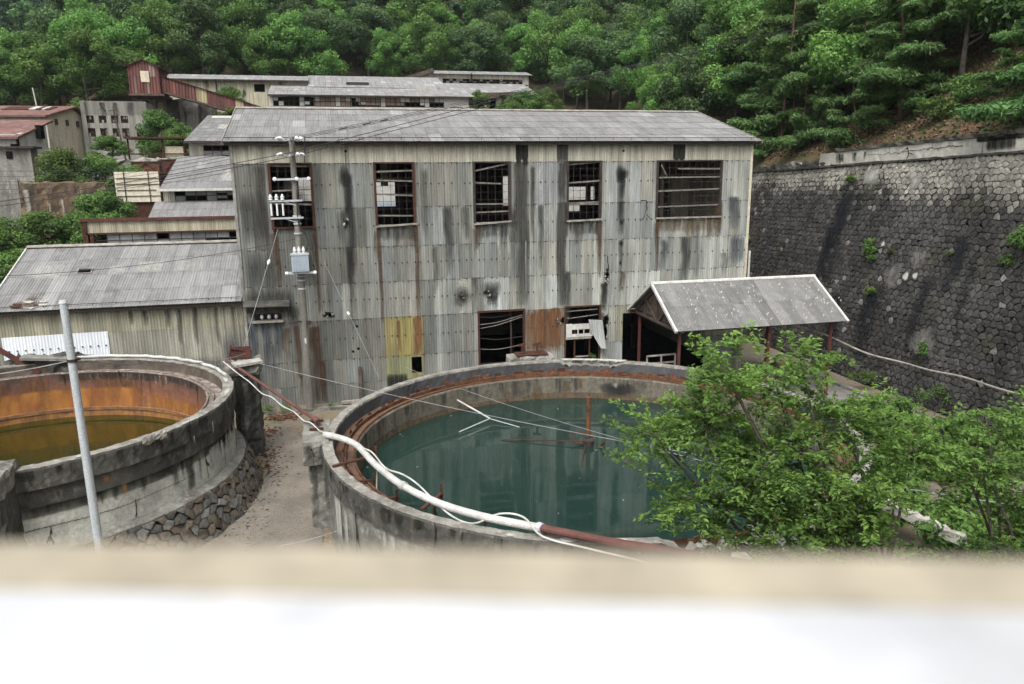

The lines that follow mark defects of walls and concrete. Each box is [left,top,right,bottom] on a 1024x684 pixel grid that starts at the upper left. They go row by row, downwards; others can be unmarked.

water stain [344,176,354,296]
water stain [478,146,543,293]
water stain [556,162,598,303]
water stain [730,197,738,220]
water stain [820,152,876,264]
corrosion [527,308,561,349]
corrosion [0,375,195,417]